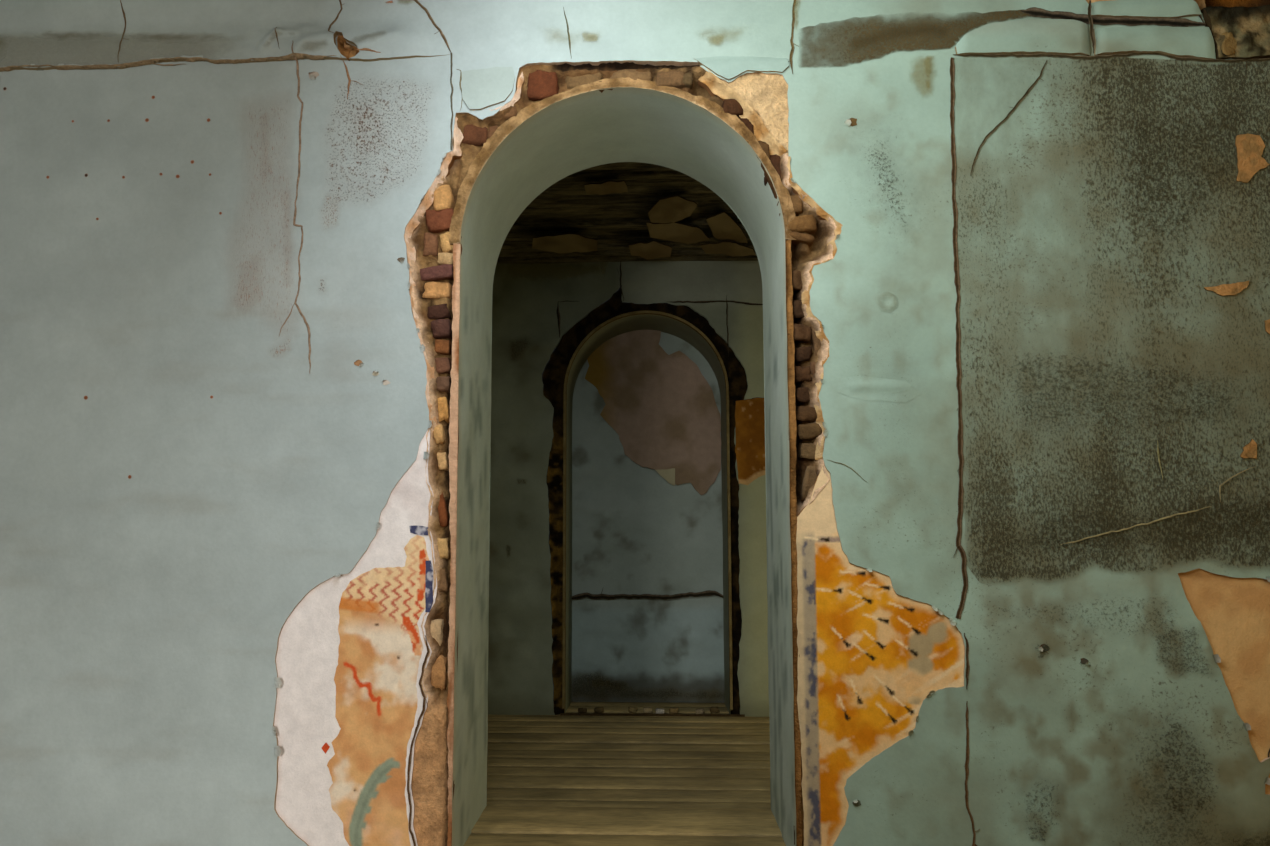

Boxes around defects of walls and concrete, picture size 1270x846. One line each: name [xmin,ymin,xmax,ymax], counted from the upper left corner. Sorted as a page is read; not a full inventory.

crack [0,0,381,373]
crack [414,0,463,150]
flaking render [272,62,964,846]
water stain [802,9,1043,67]
crack [950,0,1270,846]
water stain [956,57,1270,582]
spalling [1194,0,1270,60]
peeling [1178,568,1270,761]